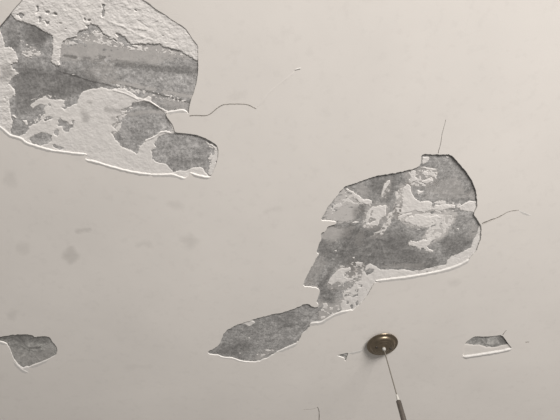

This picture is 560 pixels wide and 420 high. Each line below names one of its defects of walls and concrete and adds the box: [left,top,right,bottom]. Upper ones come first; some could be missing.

peeling [0,0,218,180]
crack [482,210,531,224]
peeling [208,154,482,363]
peeling [0,334,57,373]
peeling [462,335,512,359]